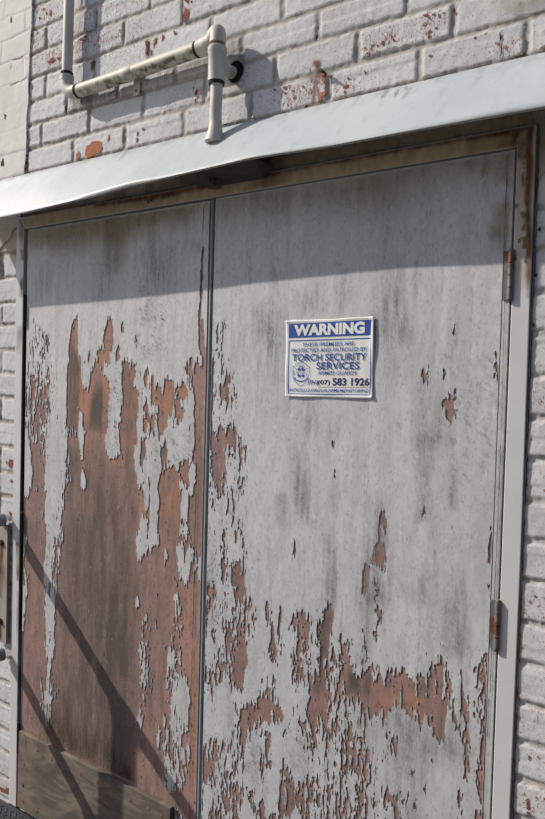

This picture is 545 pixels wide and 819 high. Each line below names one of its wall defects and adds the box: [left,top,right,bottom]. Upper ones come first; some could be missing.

rust [467,126,532,284]
peeling [21,248,488,819]